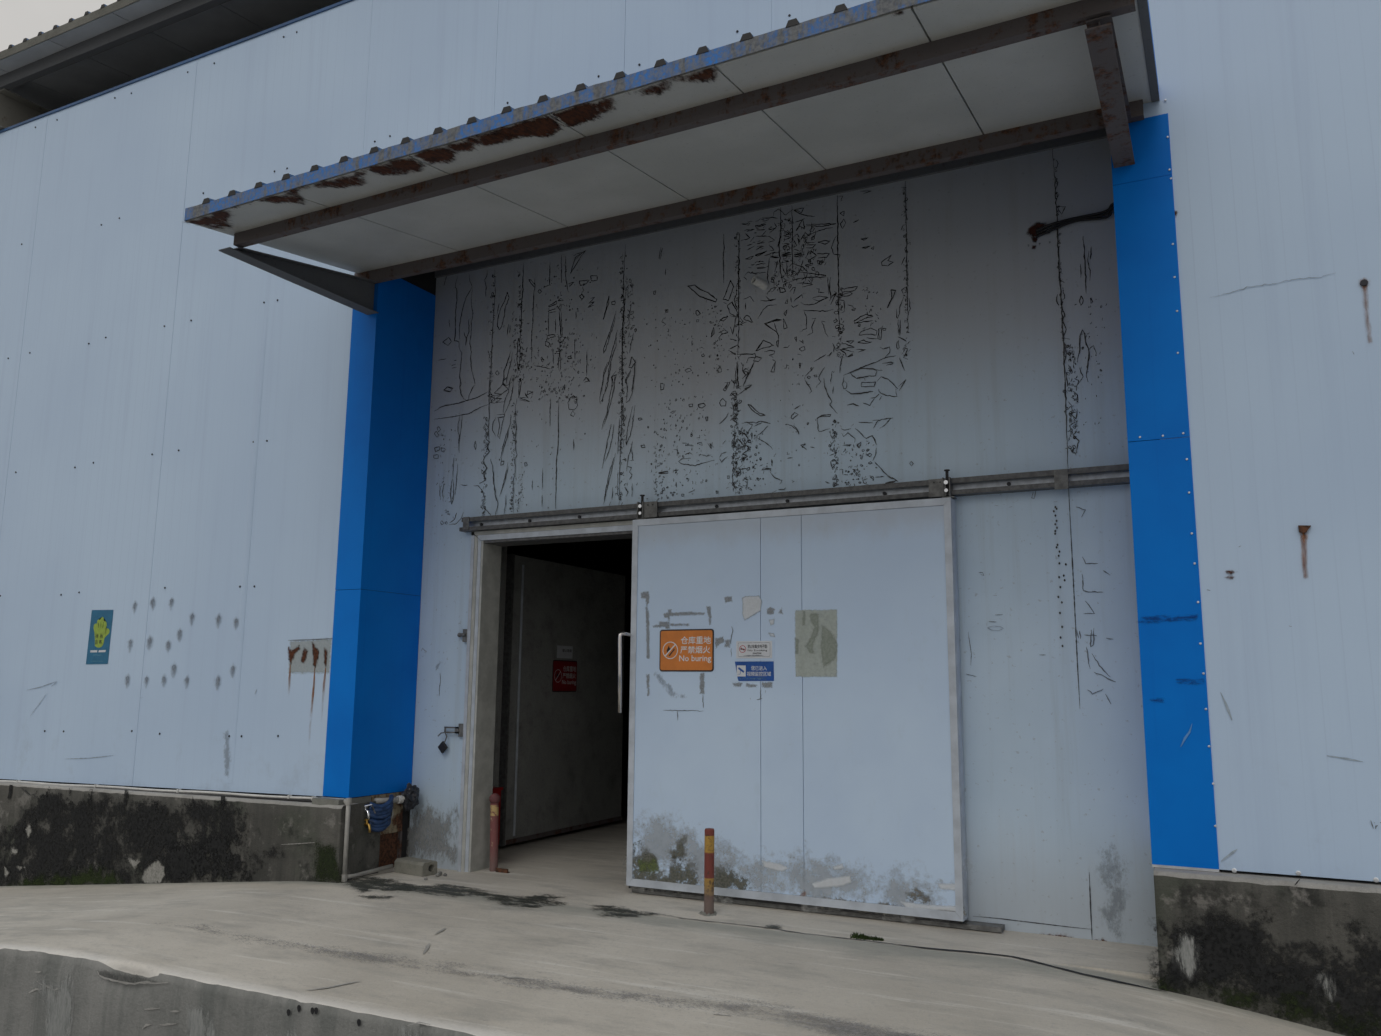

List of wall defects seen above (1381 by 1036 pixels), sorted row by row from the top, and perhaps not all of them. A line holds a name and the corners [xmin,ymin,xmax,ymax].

rust [639,68,717,95]
rust [185,98,615,229]
peeling [433,182,911,525]
peeling [1052,149,1107,465]
rust [1298,525,1311,577]
rust [288,638,332,703]
damp [0,787,283,886]
peeling [812,864,851,888]
damp [1151,910,1381,1036]